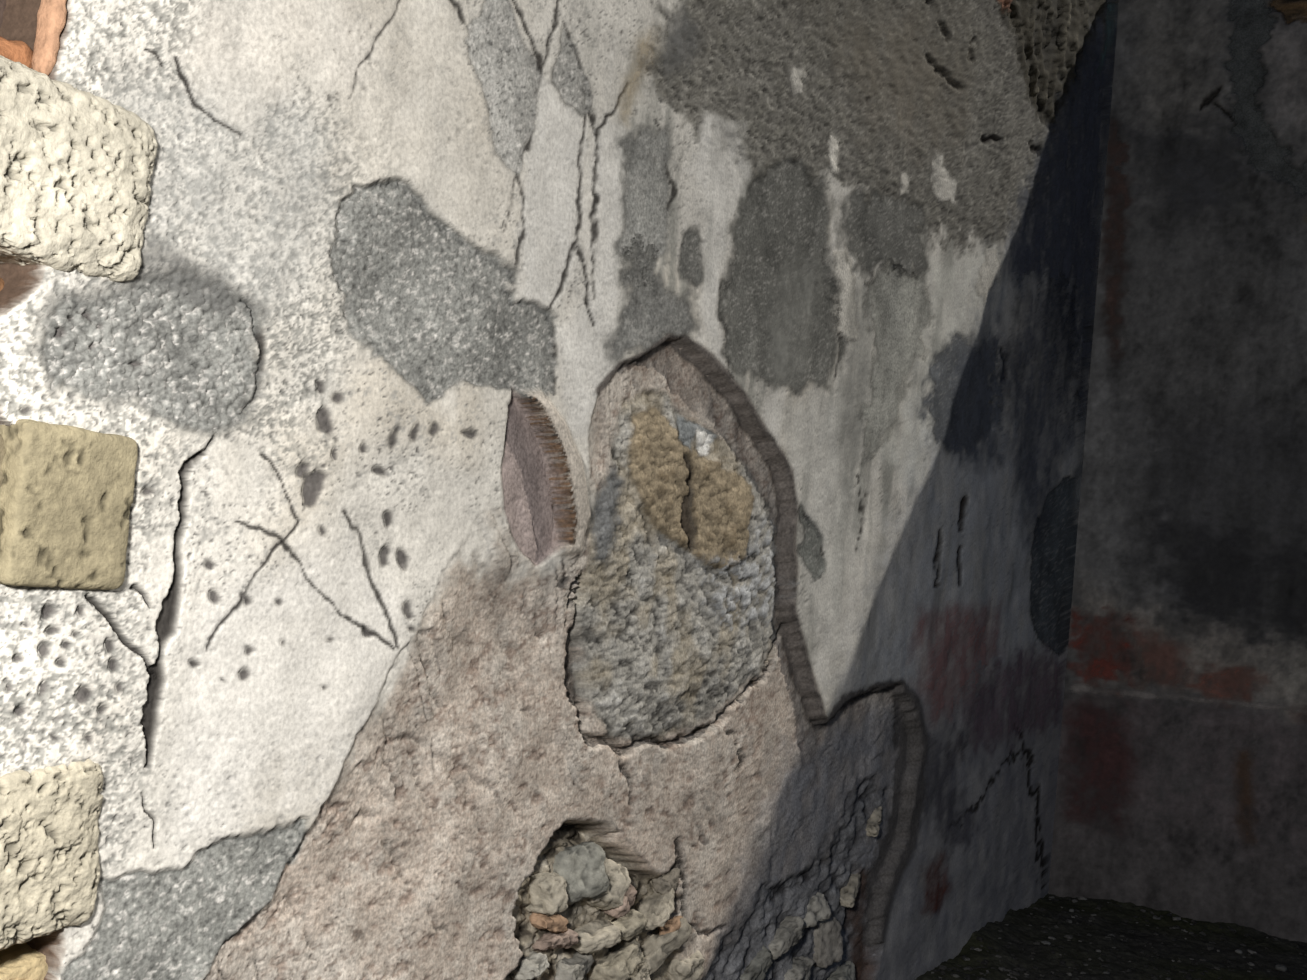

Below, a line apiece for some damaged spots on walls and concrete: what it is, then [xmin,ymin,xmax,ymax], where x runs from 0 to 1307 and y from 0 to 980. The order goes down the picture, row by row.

crack [353,0,400,87]
crack [450,0,465,23]
crack [512,0,581,95]
flaking render [1270,0,1307,24]
crack [508,135,531,284]
crack [549,83,628,395]
crack [84,438,212,766]
crack [206,454,398,650]
peeling [36,127,997,980]
flaking render [1030,476,1080,656]
crack [952,731,1046,889]